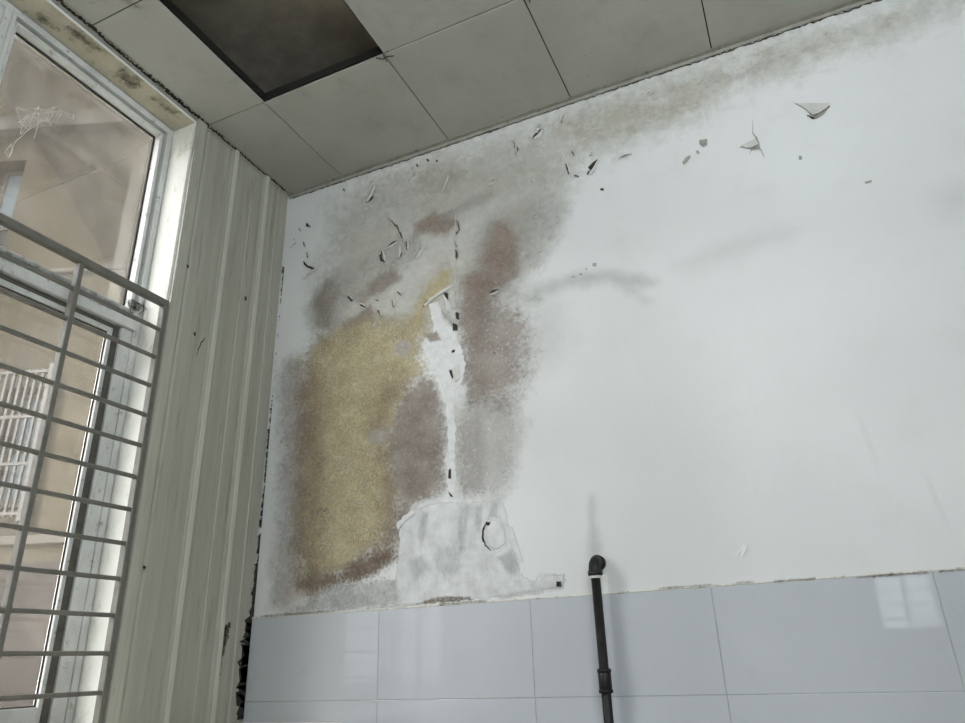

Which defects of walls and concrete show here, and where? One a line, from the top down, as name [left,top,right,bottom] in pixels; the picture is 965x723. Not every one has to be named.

spalling [794,102,830,119]
spalling [740,120,764,156]
peeling [289,222,316,279]
peeling [379,217,427,266]
peeling [393,284,543,605]